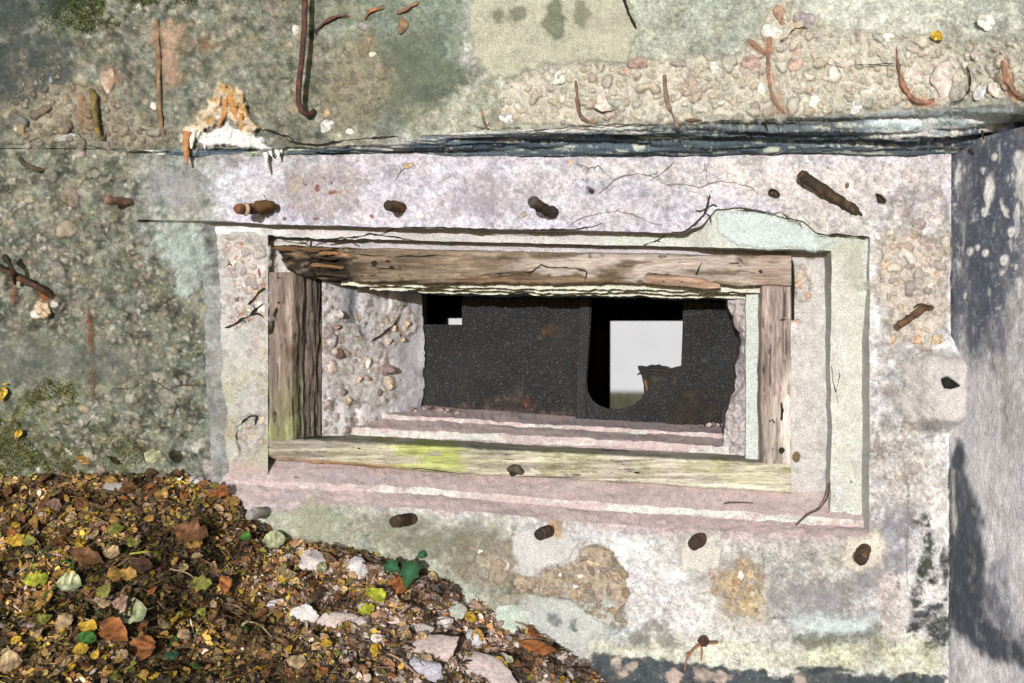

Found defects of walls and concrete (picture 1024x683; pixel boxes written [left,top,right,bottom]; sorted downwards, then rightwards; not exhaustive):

rust [150,19,184,84]
spalling [495,0,1024,127]
water stain [157,82,283,206]
rust [254,199,279,216]
crack [267,162,868,246]
spalling [446,533,630,629]
water stain [885,441,1024,668]